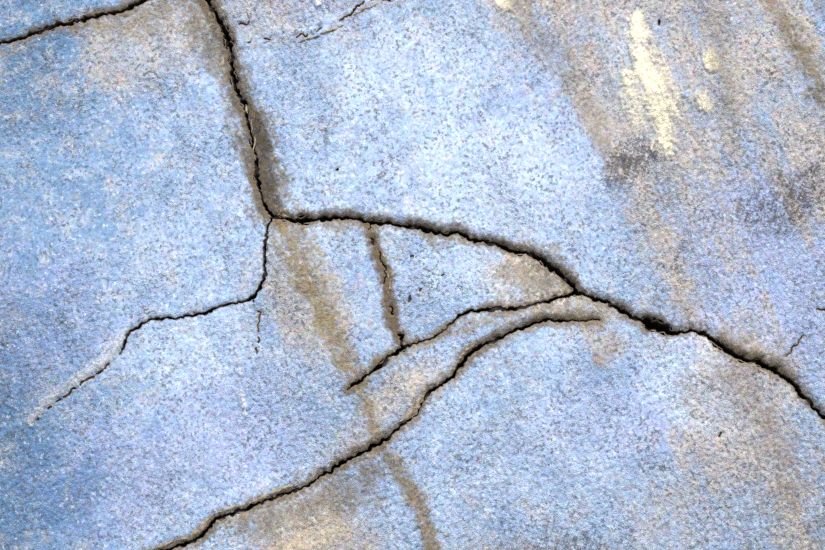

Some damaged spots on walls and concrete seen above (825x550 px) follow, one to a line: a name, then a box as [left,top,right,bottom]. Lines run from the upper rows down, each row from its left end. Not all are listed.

crack [0,0,151,46]
crack [36,0,825,421]
crack [152,317,601,550]